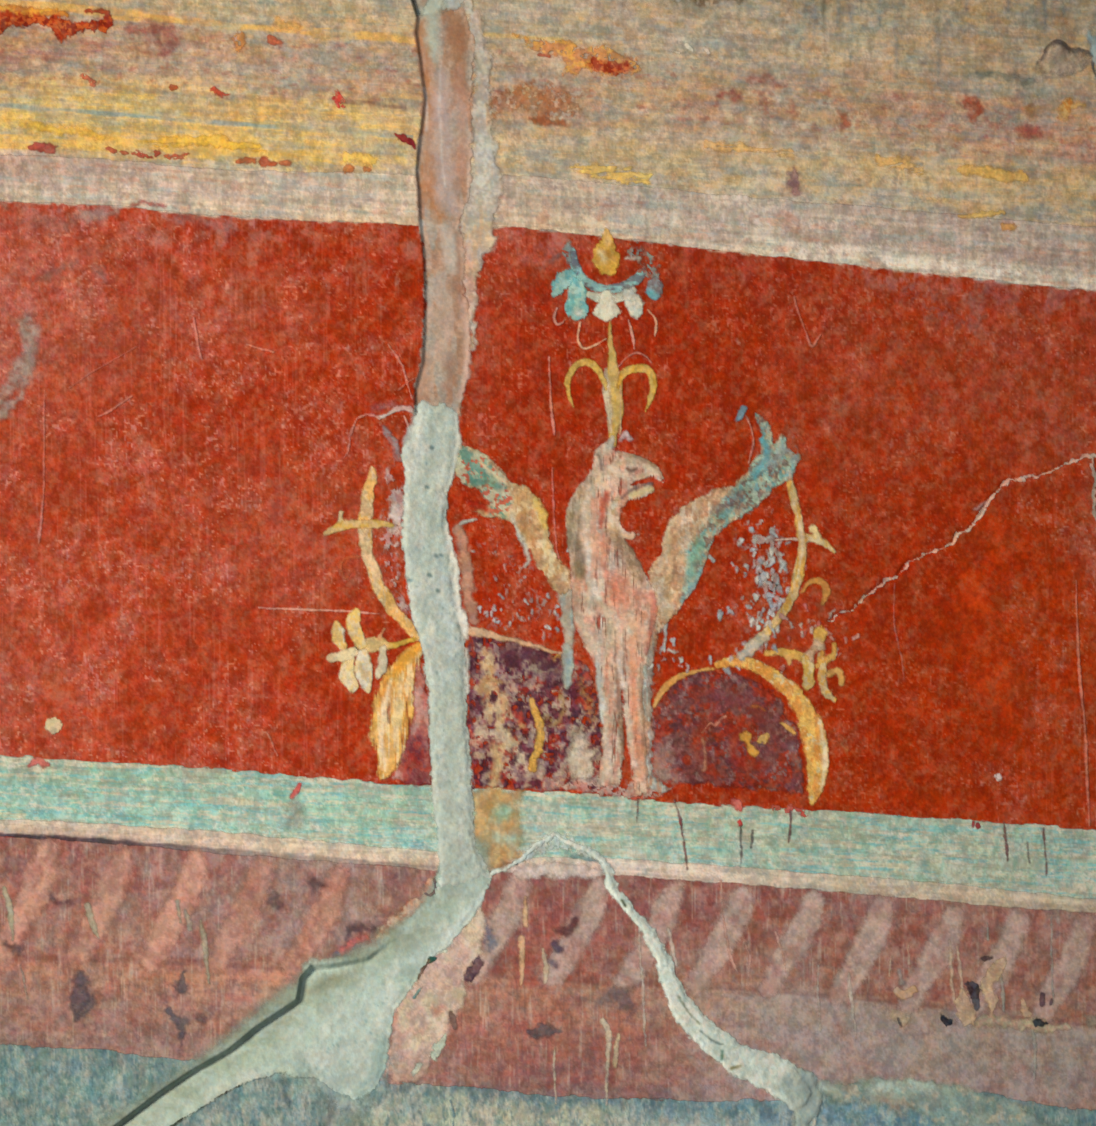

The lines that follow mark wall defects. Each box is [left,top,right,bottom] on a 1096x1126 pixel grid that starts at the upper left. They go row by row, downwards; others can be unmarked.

peeling [0,4,113,43]
peeling [490,33,641,126]
peeling [965,97,983,120]
flaking render [1035,32,1096,78]
crack [101,0,822,1126]
crack [828,453,1096,622]